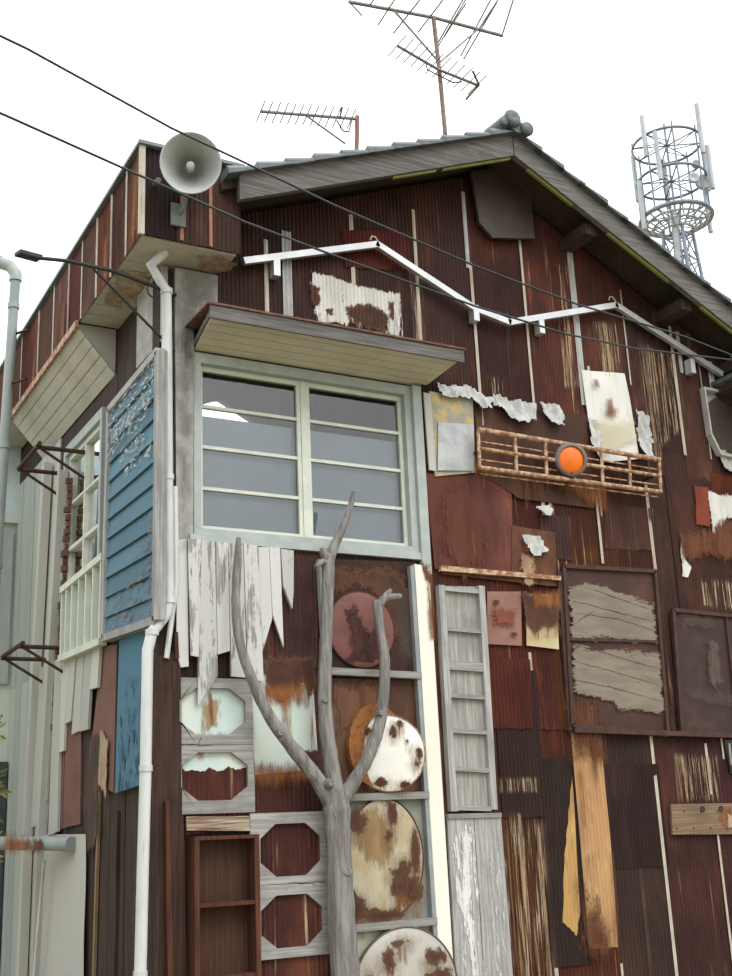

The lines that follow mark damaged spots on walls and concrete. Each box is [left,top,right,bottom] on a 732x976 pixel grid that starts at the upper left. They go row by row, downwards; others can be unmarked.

peeling [309,271,403,336]
peeling [107,358,154,473]
rust [422,407,607,640]
rust [680,485,732,563]
peeling [708,490,732,533]
rust [334,564,413,664]
rust [389,720,423,766]
rust [350,801,426,935]
peeling [451,821,510,976]
rust [510,815,552,976]
rust [382,938,411,976]
rust [424,946,453,976]